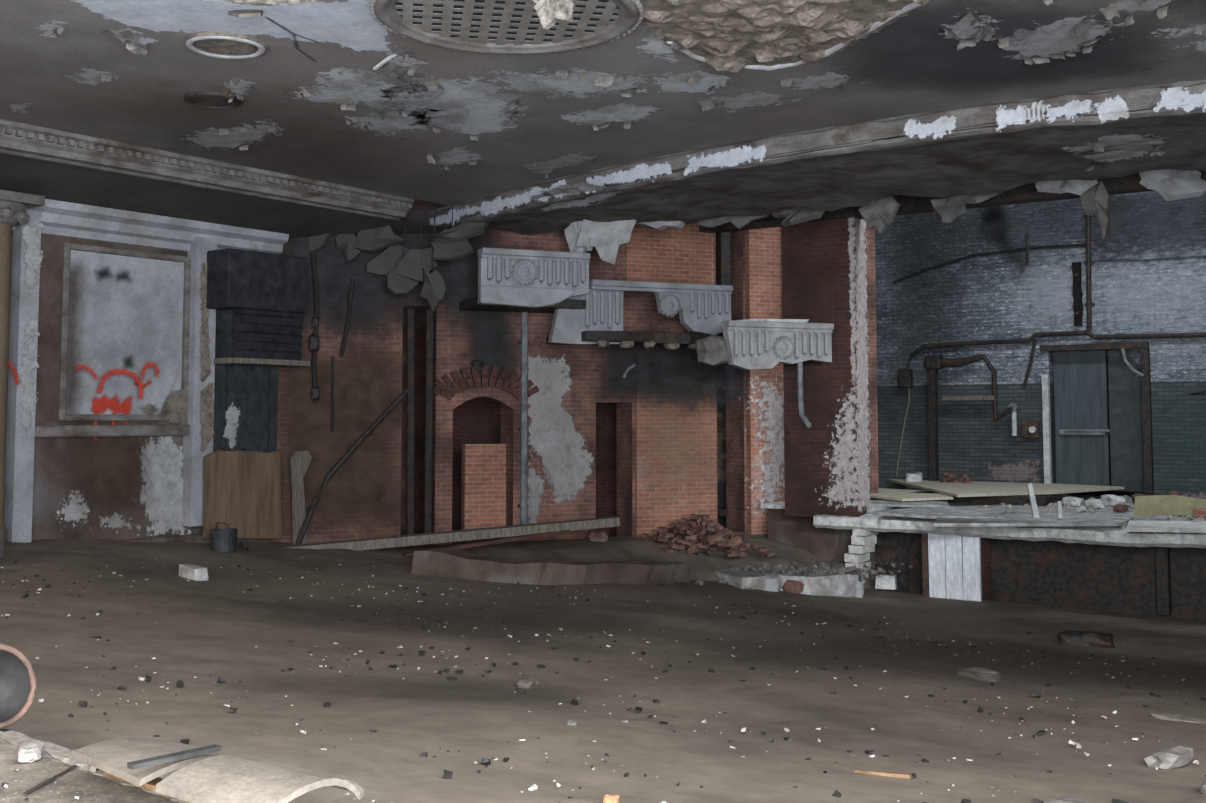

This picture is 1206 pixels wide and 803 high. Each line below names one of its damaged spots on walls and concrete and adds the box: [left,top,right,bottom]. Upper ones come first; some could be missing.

peeling [31,19,69,39]
peeling [933,0,1206,65]
flaking render [63,0,933,176]
peeling [903,114,957,140]
peeling [996,95,1171,172]
peeling [1153,87,1206,113]
peeling [430,144,767,226]
peeling [56,262,241,538]
flaking render [527,352,594,524]
spalling [597,335,731,366]
peeling [741,370,785,521]
peeling [815,217,871,515]